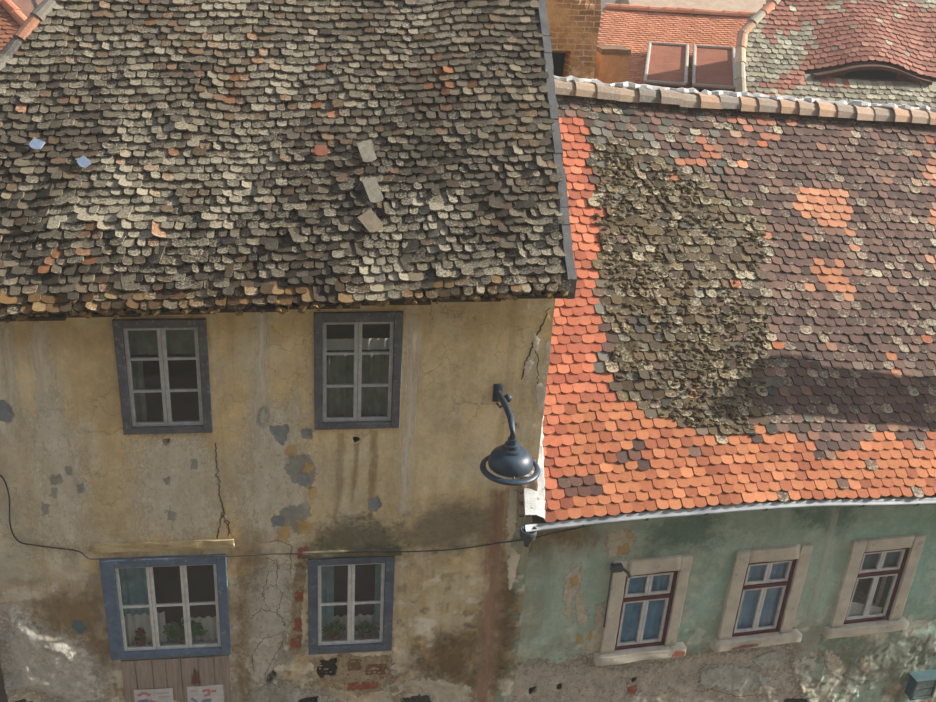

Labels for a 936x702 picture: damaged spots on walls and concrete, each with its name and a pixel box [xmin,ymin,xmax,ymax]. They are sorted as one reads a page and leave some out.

spalling [0,400,14,423]
crack [215,443,231,539]
peeling [256,407,317,541]
water stain [236,312,489,559]
crack [521,308,551,419]
peeling [235,560,308,694]
crack [252,540,292,680]
spalling [299,653,474,702]
spalling [513,563,816,702]